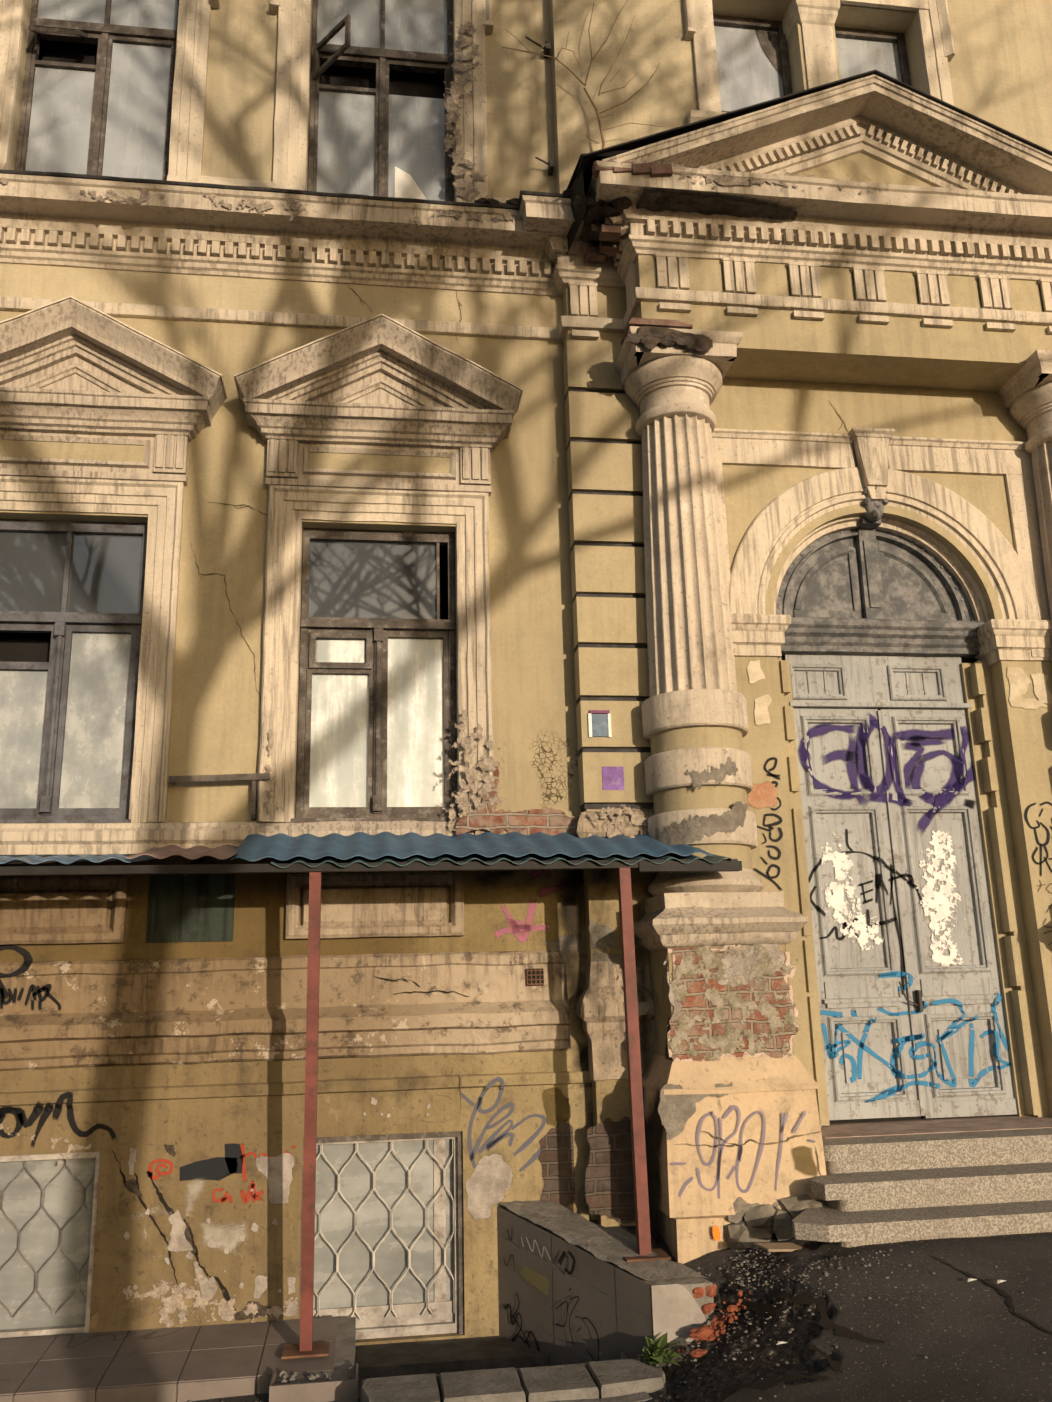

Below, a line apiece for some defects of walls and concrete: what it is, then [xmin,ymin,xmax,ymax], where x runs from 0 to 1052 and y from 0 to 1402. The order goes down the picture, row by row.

peeling [408,21,538,231]
peeling [657,161,890,204]
spalling [637,326,713,351]
crack [209,502,268,517]
crack [190,544,261,699]
spalling [442,710,778,854]
spalling [663,944,799,1062]
spalling [0,1123,101,1165]
spalling [538,1083,733,1223]
crack [112,1140,236,1318]
spalling [122,1147,298,1327]
crack [933,1256,1052,1333]